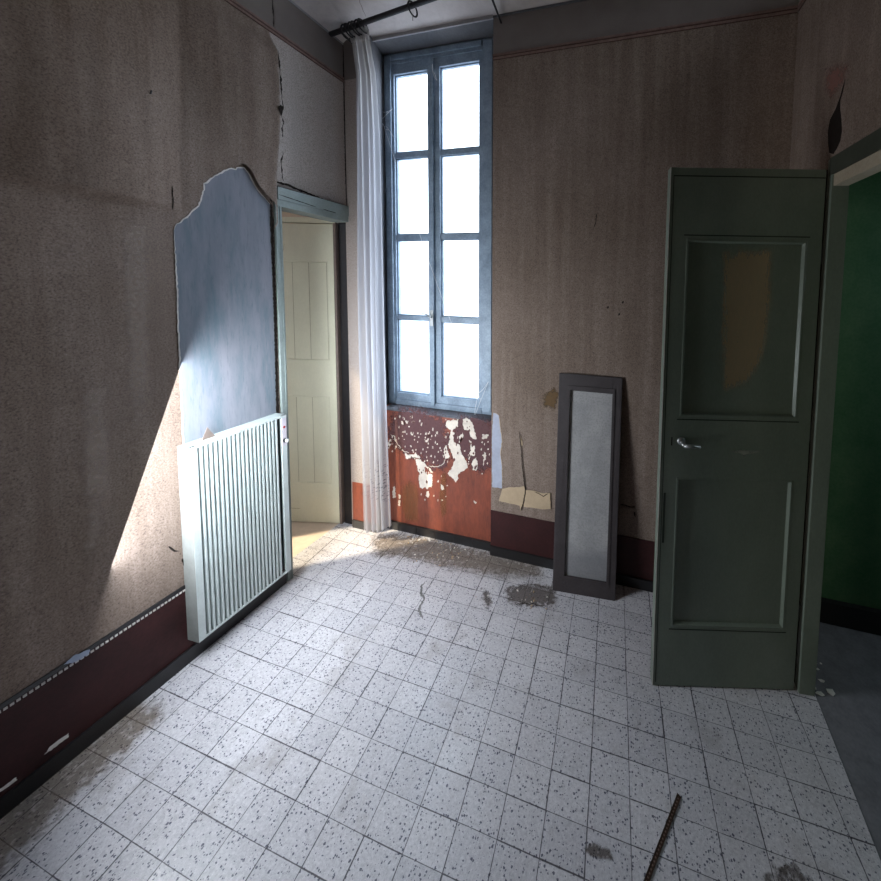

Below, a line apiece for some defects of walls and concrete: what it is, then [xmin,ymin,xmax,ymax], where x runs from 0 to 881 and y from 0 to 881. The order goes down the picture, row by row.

crack [276,51,284,181]
peeling [173,167,276,444]
peeling [388,413,503,501]
leakage [375,534,556,607]
leakage [765,865,810,881]